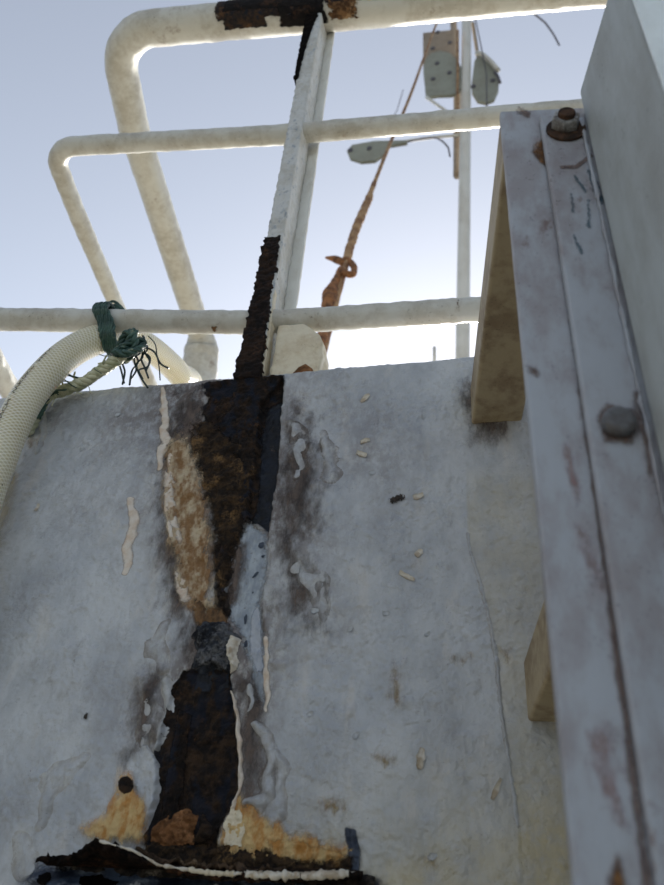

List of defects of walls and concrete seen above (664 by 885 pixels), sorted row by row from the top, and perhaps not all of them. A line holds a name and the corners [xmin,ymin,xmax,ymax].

rust [214,0,359,30]
rust [162,235,313,625]
peeling [224,401,283,706]
peeling [80,742,161,844]
peeling [230,691,244,809]
rust [143,668,353,870]
peeling [36,872,52,885]
peeling [79,874,119,885]